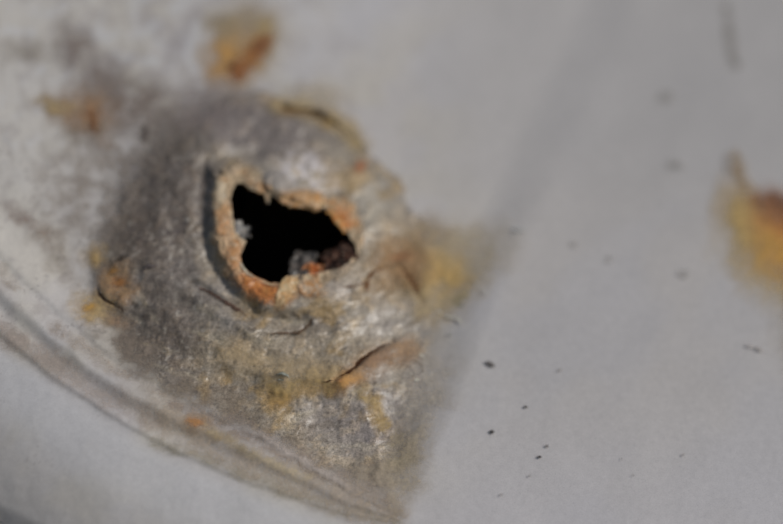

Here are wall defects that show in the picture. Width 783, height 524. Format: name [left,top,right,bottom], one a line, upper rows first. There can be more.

rust [206,9,277,80]
crack [282,105,353,139]
spalling [215,179,355,306]
rust [726,154,783,291]
crack [326,343,388,383]